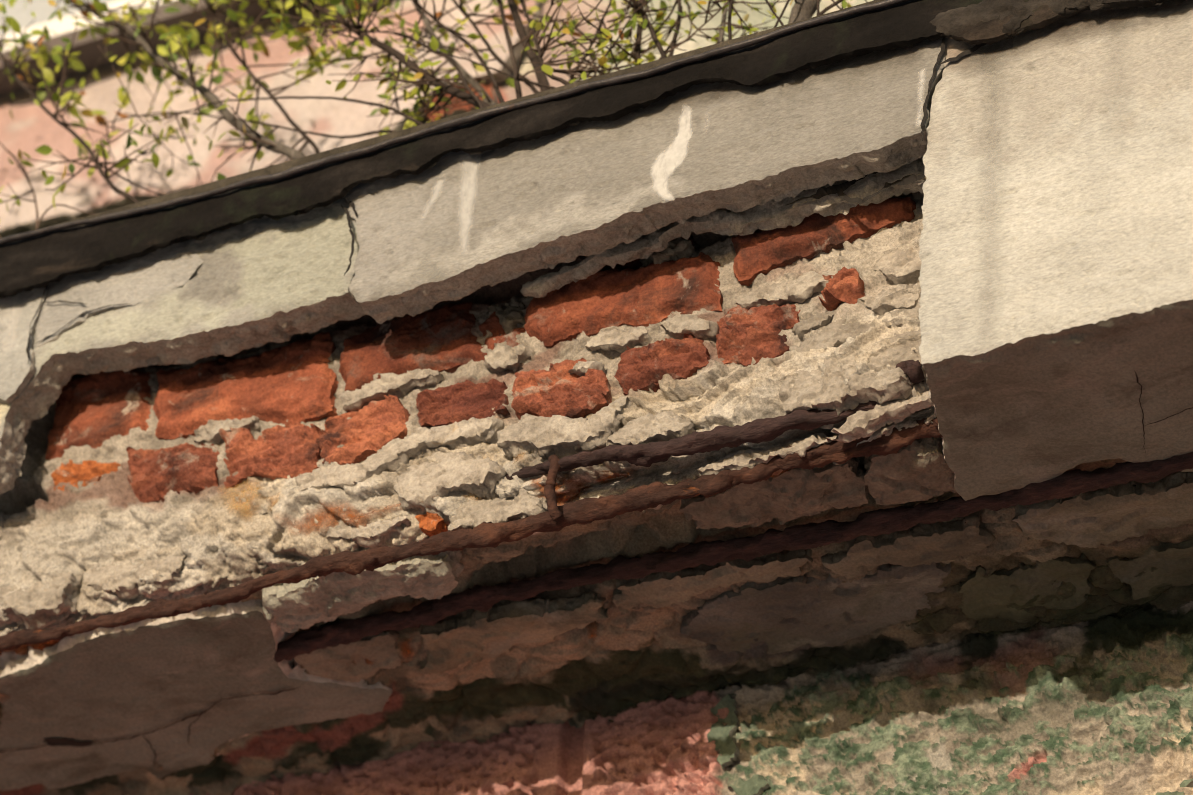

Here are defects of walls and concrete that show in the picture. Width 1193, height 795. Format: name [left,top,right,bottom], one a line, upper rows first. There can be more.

efflorescence [652,107,691,199]
crack [787,37,986,205]
crack [341,201,358,276]
spalling [0,157,937,636]
rust [297,507,367,530]
rust [535,473,629,506]
rust [0,640,61,655]
spalling [0,417,1193,795]